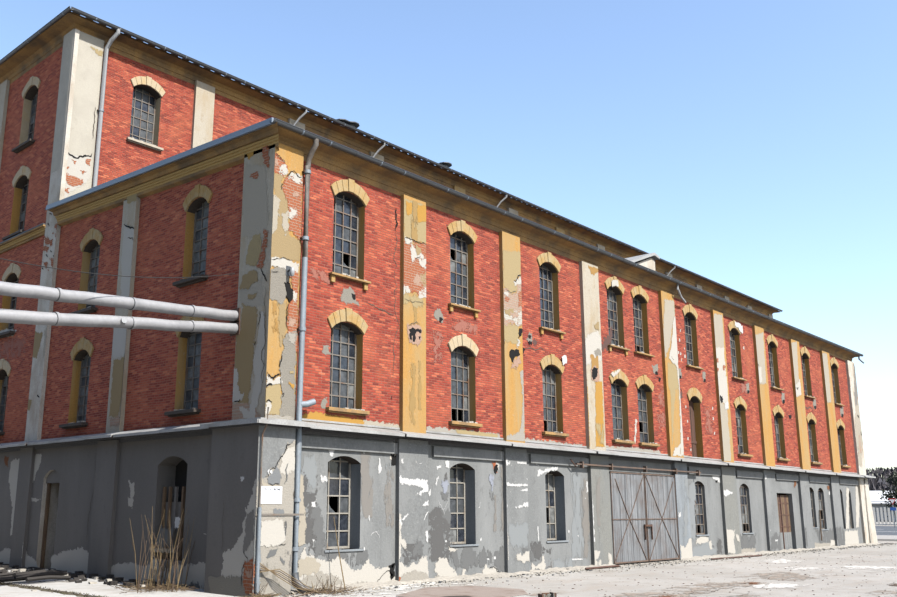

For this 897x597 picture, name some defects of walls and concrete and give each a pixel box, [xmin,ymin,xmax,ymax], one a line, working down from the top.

peeling [232,145,303,421]
spalling [407,323,422,347]
flaking render [404,198,426,296]
peeling [507,370,525,441]
peeling [503,249,532,362]
peeling [652,299,691,456]
peeling [712,314,731,461]
peeling [8,458,19,535]
peeling [50,546,89,574]
spalling [111,440,502,597]